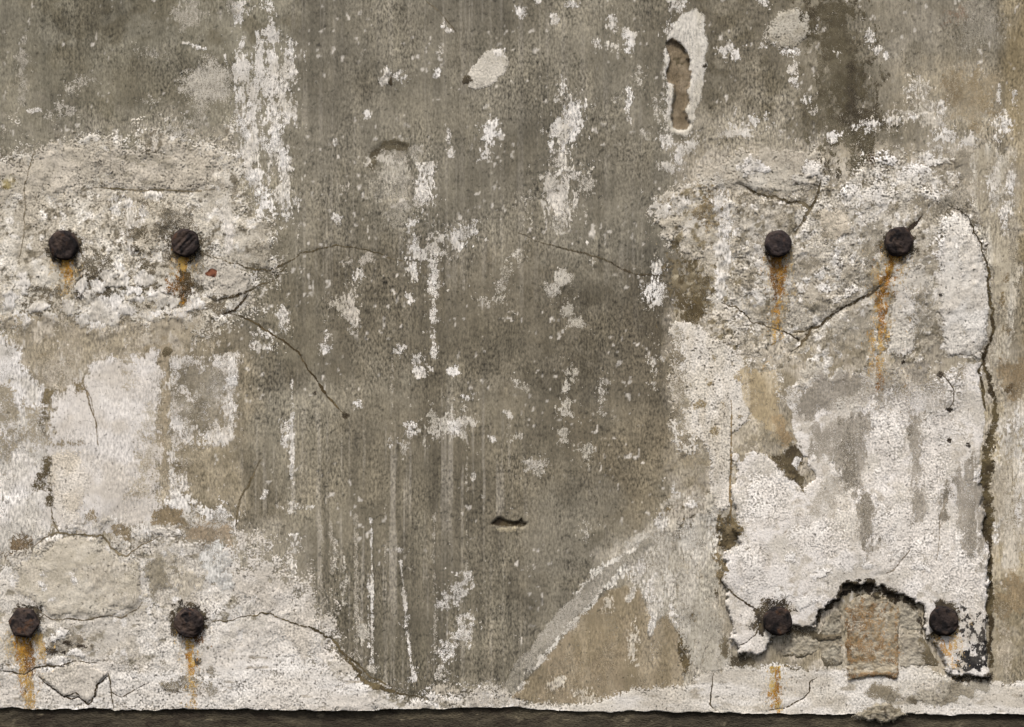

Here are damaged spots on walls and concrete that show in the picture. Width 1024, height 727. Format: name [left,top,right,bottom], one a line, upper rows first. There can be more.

peeling [639,0,741,176]
peeling [823,130,843,145]
corrosion [164,249,204,318]
crack [205,244,403,413]
corrosion [759,246,802,345]
crack [721,275,892,352]
corrosion [861,246,913,408]
crack [907,208,999,668]
corrosion [0,619,55,710]
crack [0,660,145,709]
corrosion [174,631,210,709]
crack [204,612,424,698]